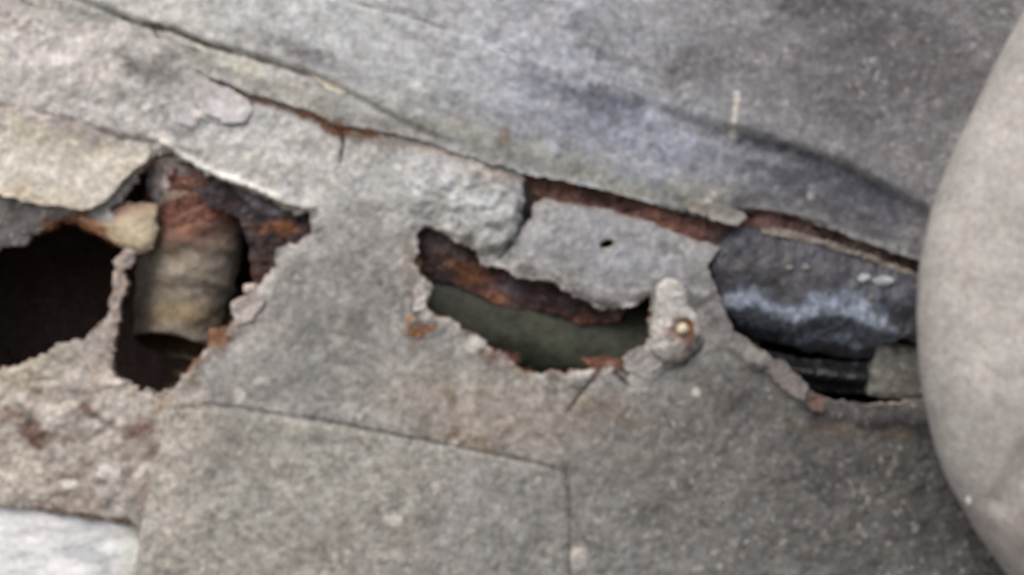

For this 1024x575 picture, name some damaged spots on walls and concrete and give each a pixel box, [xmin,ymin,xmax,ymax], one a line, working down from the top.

crack [119,16,323,86]
corrosion [209,80,387,138]
crack [338,134,346,163]
peeling [0,107,312,395]
crack [505,180,533,251]
spalling [406,226,663,382]
corrosion [678,317,694,340]
spalling [523,198,924,412]